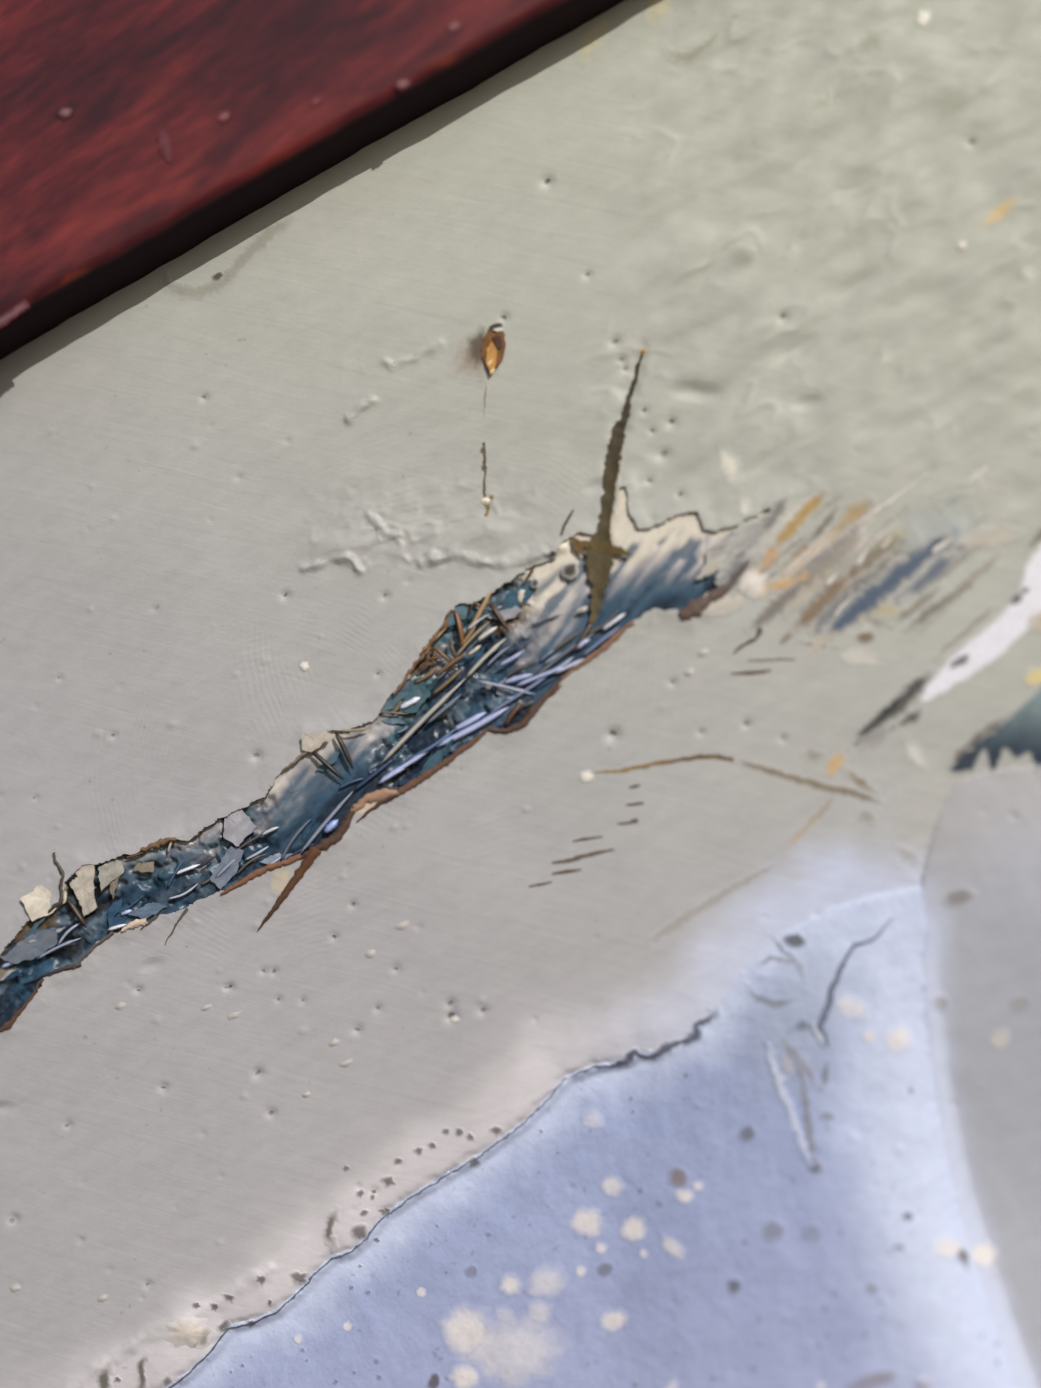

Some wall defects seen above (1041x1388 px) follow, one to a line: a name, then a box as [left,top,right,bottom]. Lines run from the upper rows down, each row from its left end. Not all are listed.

rust [445,321,507,421]
rust [480,442,494,516]
peeling [0,486,771,1032]
peeling [741,952,827,1167]
crack [765,918,893,1092]
peeling [954,1240,974,1273]